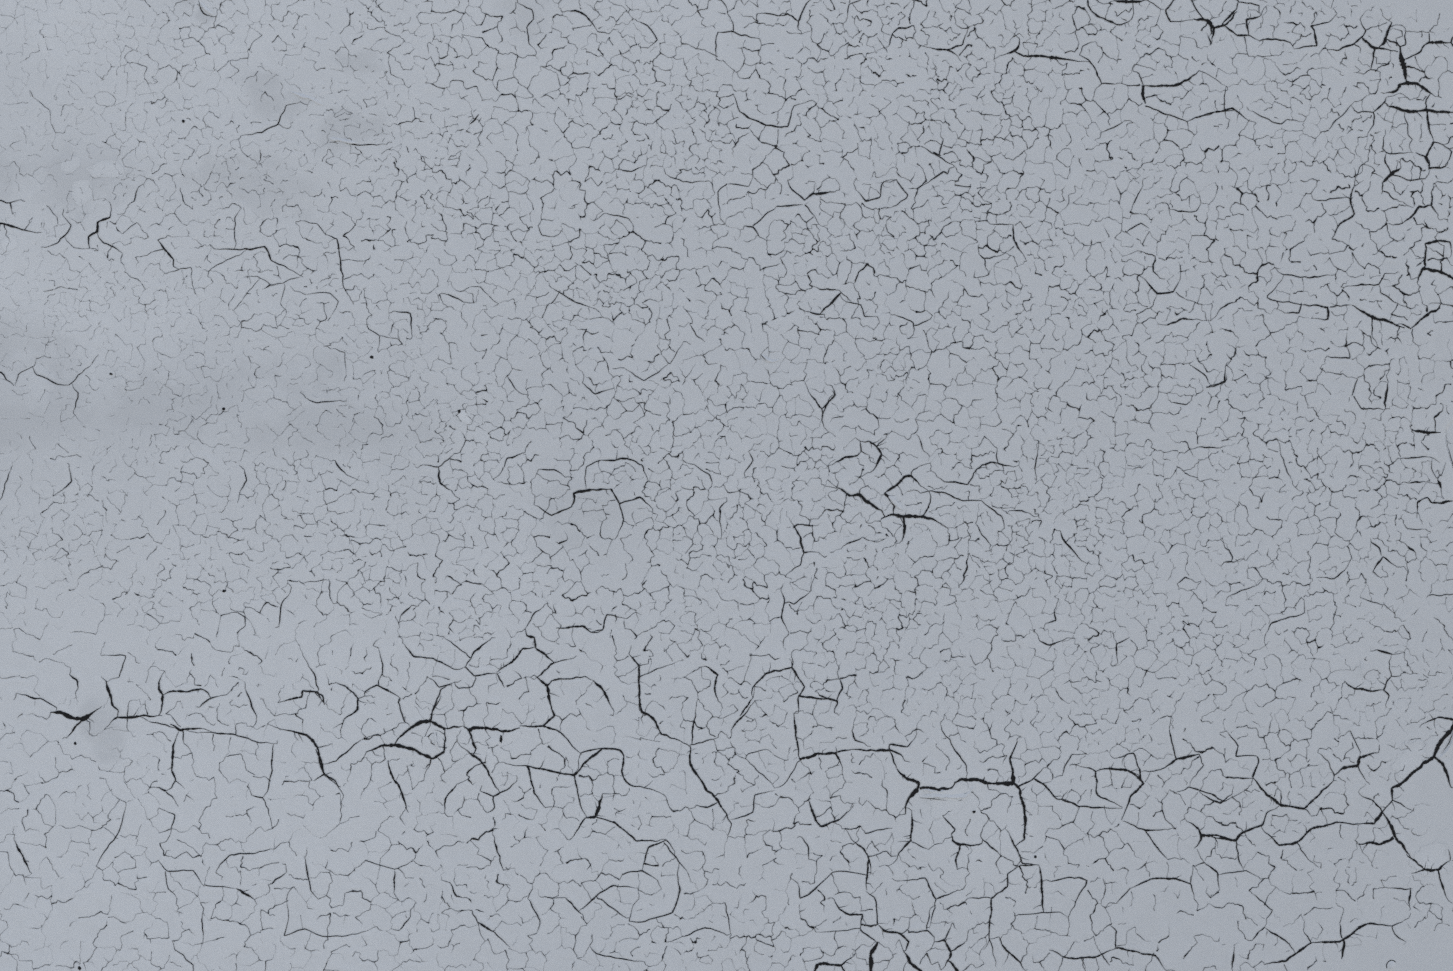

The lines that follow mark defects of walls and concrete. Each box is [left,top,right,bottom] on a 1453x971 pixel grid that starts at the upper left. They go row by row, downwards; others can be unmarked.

crack [715,0,810,52]
crack [889,25,966,55]
crack [726,94,806,128]
crack [0,200,111,248]
crack [666,174,908,226]
crack [1007,0,1453,459]
crack [214,235,412,348]
crack [819,288,930,334]
crack [503,452,653,534]
crack [837,438,1013,583]
crack [1417,497,1452,512]
crack [17,528,1453,971]